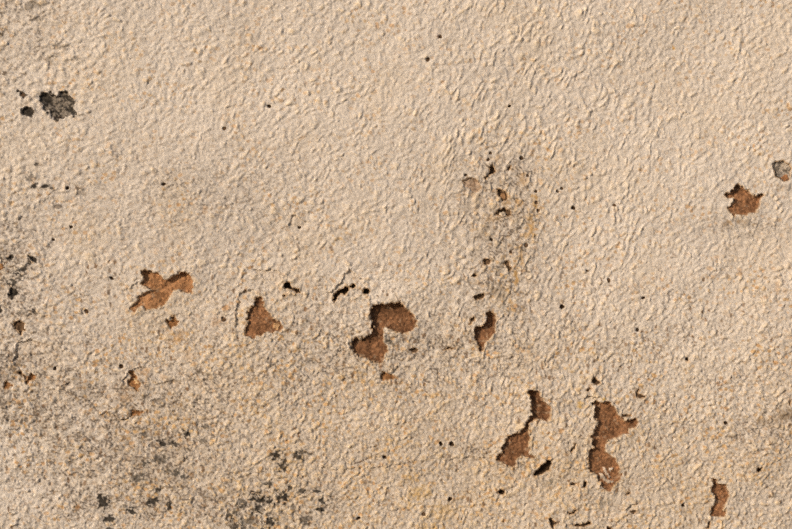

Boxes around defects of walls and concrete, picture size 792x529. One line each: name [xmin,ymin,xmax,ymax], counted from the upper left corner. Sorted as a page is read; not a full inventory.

spalling [15,88,79,122]
spalling [771,158,792,184]
flaking render [723,182,766,218]
flaking render [121,267,195,331]
flaking render [233,287,285,340]
flaking render [321,267,420,382]
flaking render [469,310,498,354]
flaking render [444,389,553,476]
flaking render [571,377,641,493]
flaking render [707,477,731,528]